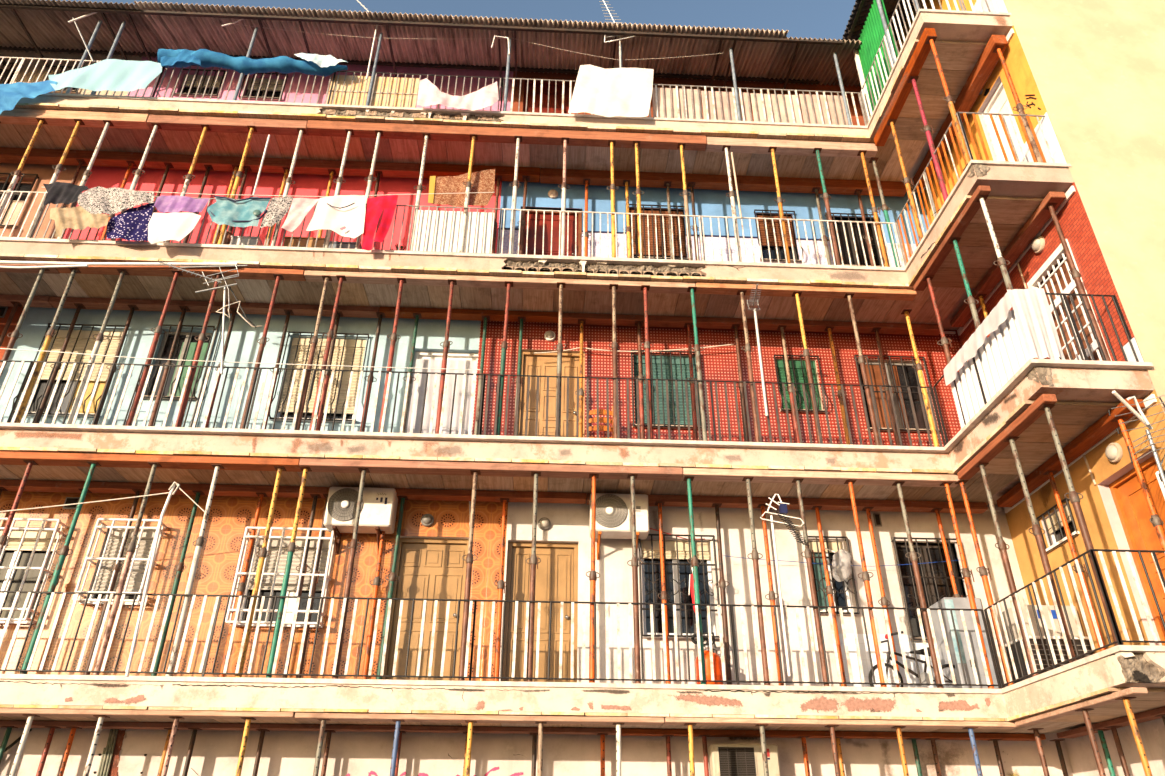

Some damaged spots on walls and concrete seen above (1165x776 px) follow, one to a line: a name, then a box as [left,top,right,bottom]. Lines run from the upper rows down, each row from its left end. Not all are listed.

spalling [1115,652,1165,683]
peeling [676,694,742,706]
peeling [801,696,895,713]
peeling [939,698,991,711]